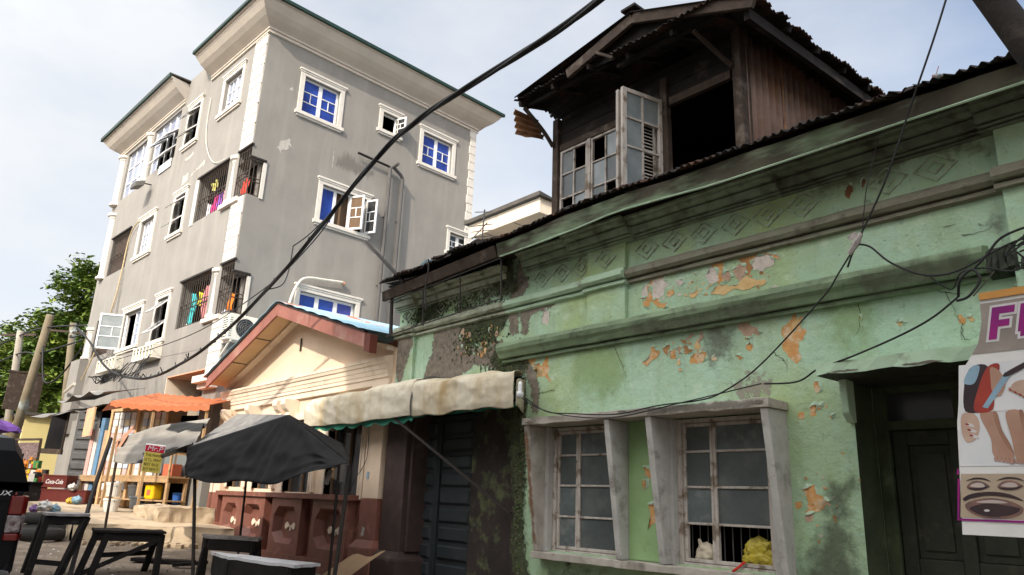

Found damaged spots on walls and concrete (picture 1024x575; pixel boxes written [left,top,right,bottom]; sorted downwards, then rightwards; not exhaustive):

peeling [641,251,781,310]
flaking render [396,337,416,382]
flaking render [424,304,554,379]
peeling [642,326,717,371]
peeling [781,314,807,364]
peeling [798,369,858,420]
peeling [642,465,656,529]
peeling [795,473,838,544]
damp [809,480,858,575]